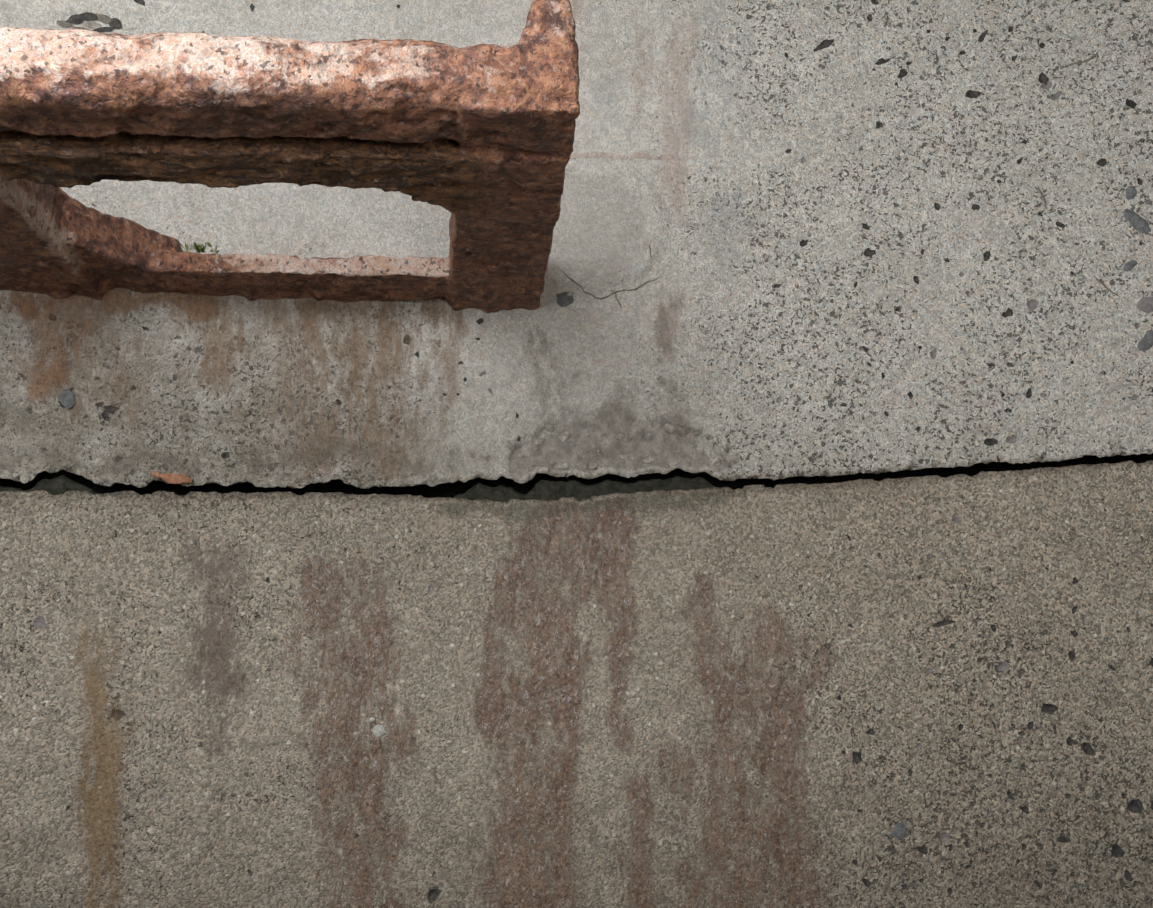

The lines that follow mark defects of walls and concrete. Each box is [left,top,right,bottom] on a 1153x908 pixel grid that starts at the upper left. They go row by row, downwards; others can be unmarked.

crack [0,454,1153,502]